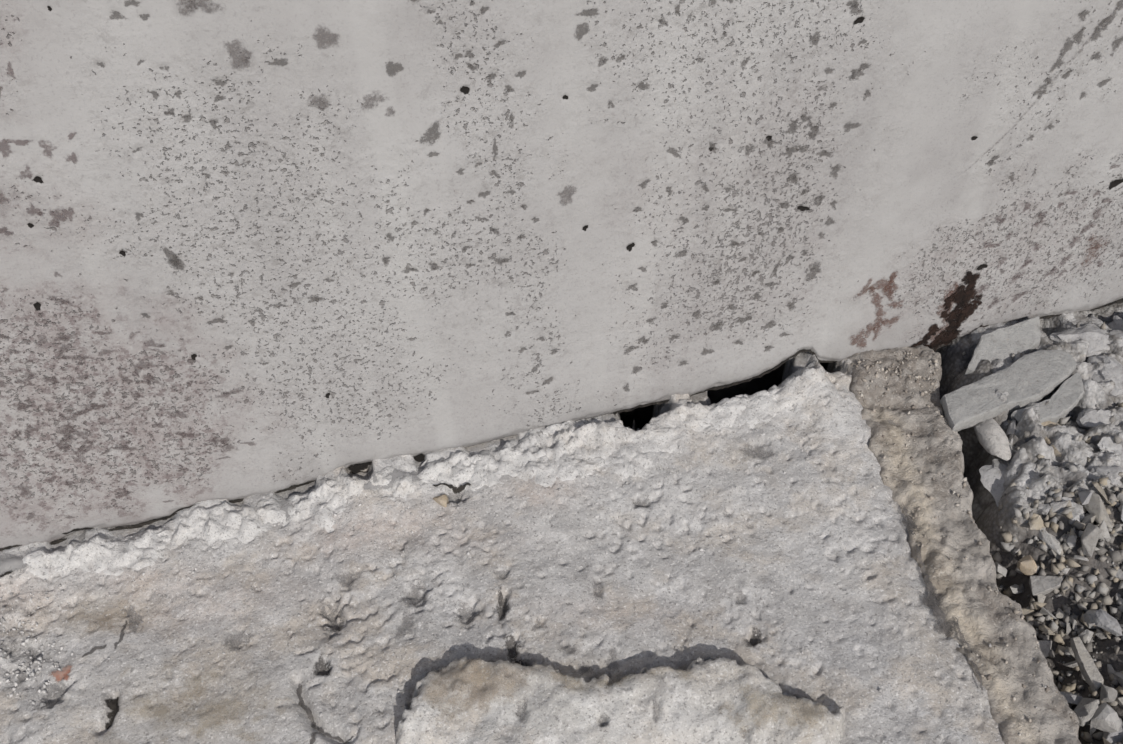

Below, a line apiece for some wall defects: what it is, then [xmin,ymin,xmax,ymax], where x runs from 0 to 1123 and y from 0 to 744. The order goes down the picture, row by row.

spalling [788,174,837,238]
spalling [752,250,820,299]
rust [852,272,903,348]
rust [911,271,989,352]